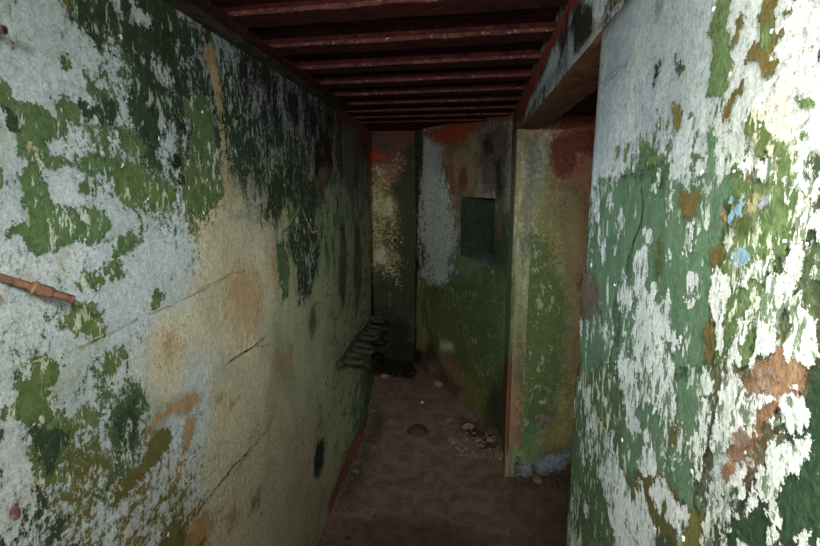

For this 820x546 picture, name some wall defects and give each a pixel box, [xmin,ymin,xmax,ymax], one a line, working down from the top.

peeling [0,0,255,349]
water stain [201,33,319,220]
peeling [97,343,129,378]
crack [1,270,243,374]
water stain [276,238,290,305]
water stain [301,223,317,337]
water stain [338,221,362,316]
peeling [506,0,820,546]
peeling [0,352,173,520]
peeling [41,513,81,546]
peeling [156,515,186,546]